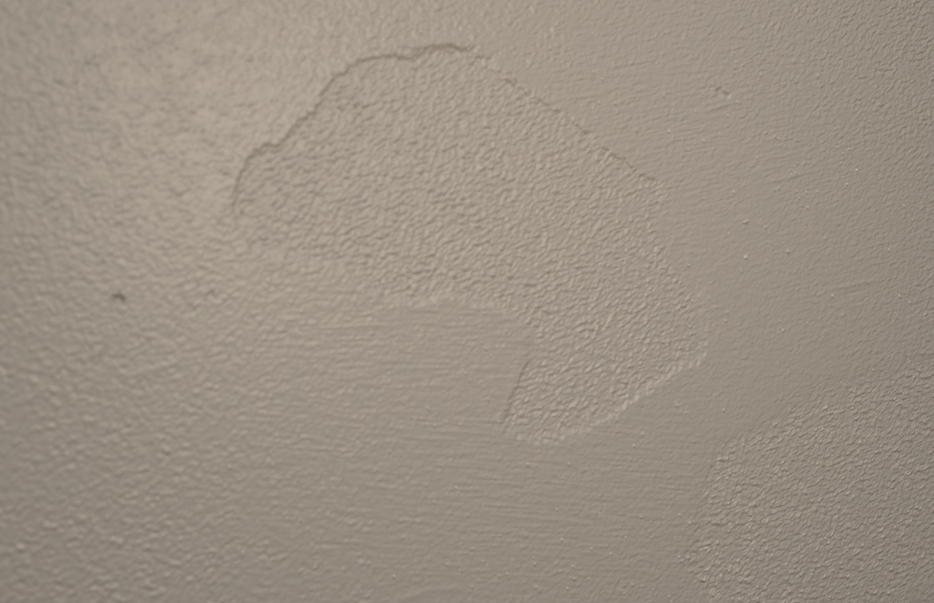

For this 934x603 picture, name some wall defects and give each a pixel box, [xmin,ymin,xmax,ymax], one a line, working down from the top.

peeling [224,39,726,451]